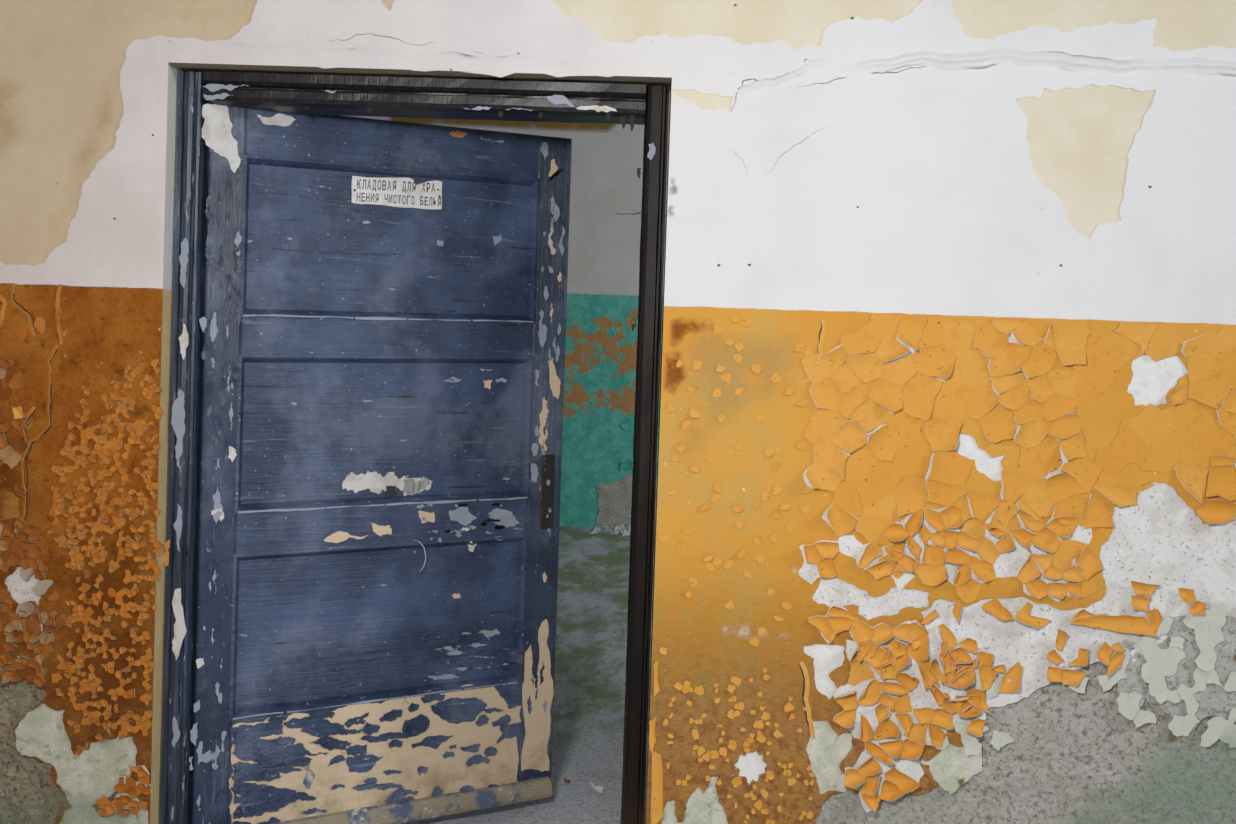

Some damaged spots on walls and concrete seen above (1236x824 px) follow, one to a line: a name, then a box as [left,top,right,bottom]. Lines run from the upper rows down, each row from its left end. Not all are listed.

peeling [0,0,257,266]
peeling [198,84,252,299]
peeling [392,95,635,181]
peeling [552,0,923,49]
peeling [1015,85,1156,239]
peeling [952,0,1236,52]
peeling [179,311,237,531]
peeling [324,523,392,543]
peeling [342,471,522,556]
peeling [531,196,565,491]
flaking render [649,314,1236,824]
peeling [172,610,554,824]